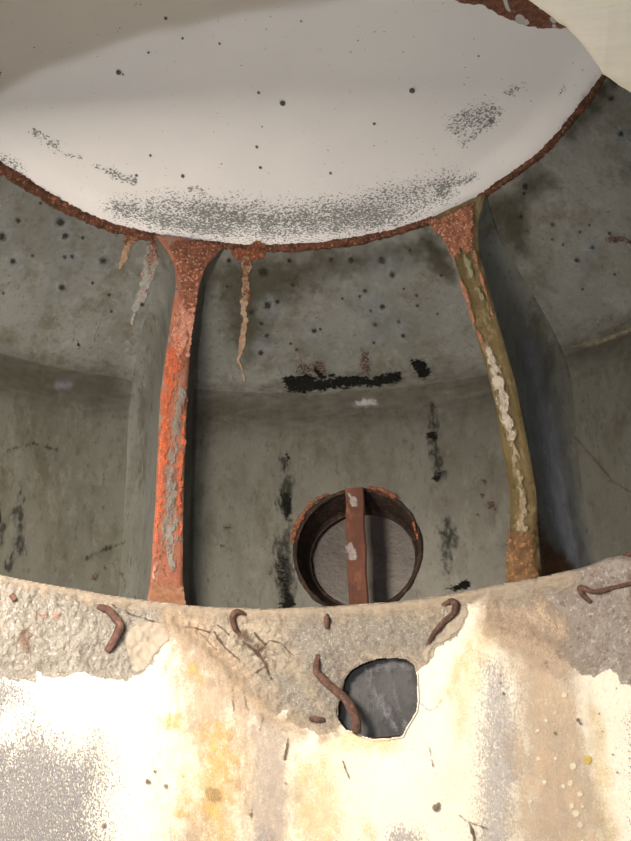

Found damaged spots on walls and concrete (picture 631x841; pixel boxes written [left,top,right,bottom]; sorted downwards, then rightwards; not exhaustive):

peeling [444,102,502,148]
corrosion [0,161,160,325]
peeling [95,162,479,245]
corrosion [169,74,607,382]
corrosion [149,579,186,605]
water stain [0,343,607,841]
corrosion [290,493,328,544]
peeling [346,542,357,560]
corrosion [505,521,573,582]
spalling [0,555,631,735]